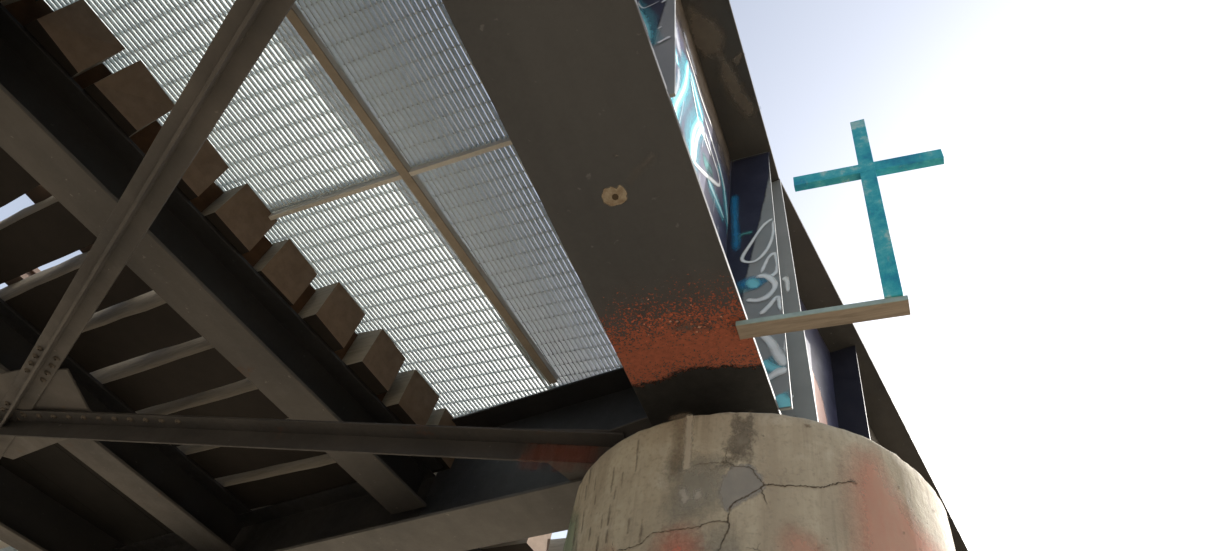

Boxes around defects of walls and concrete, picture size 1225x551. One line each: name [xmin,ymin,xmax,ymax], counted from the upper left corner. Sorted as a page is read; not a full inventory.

crack [596,448,858,551]